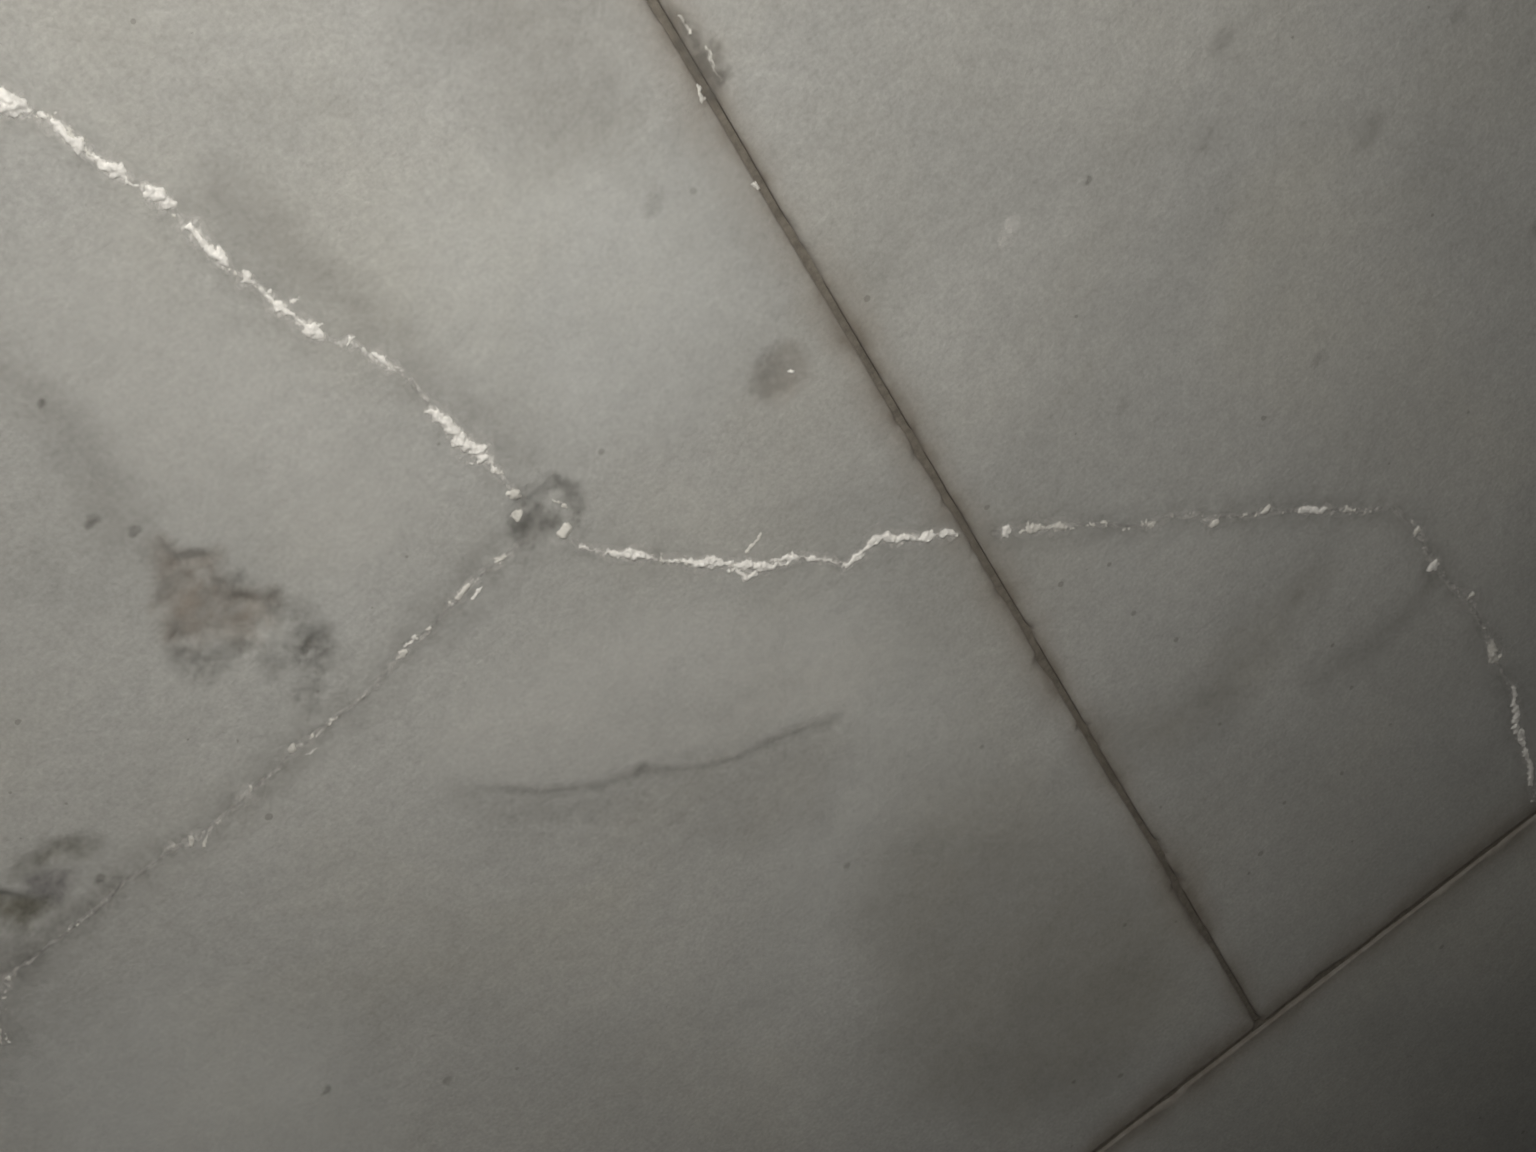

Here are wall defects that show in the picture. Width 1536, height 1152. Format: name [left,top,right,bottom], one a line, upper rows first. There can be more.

crack [0,86,510,488]
crack [0,544,520,1044]
crack [577,528,958,582]
crack [1001,504,1536,802]